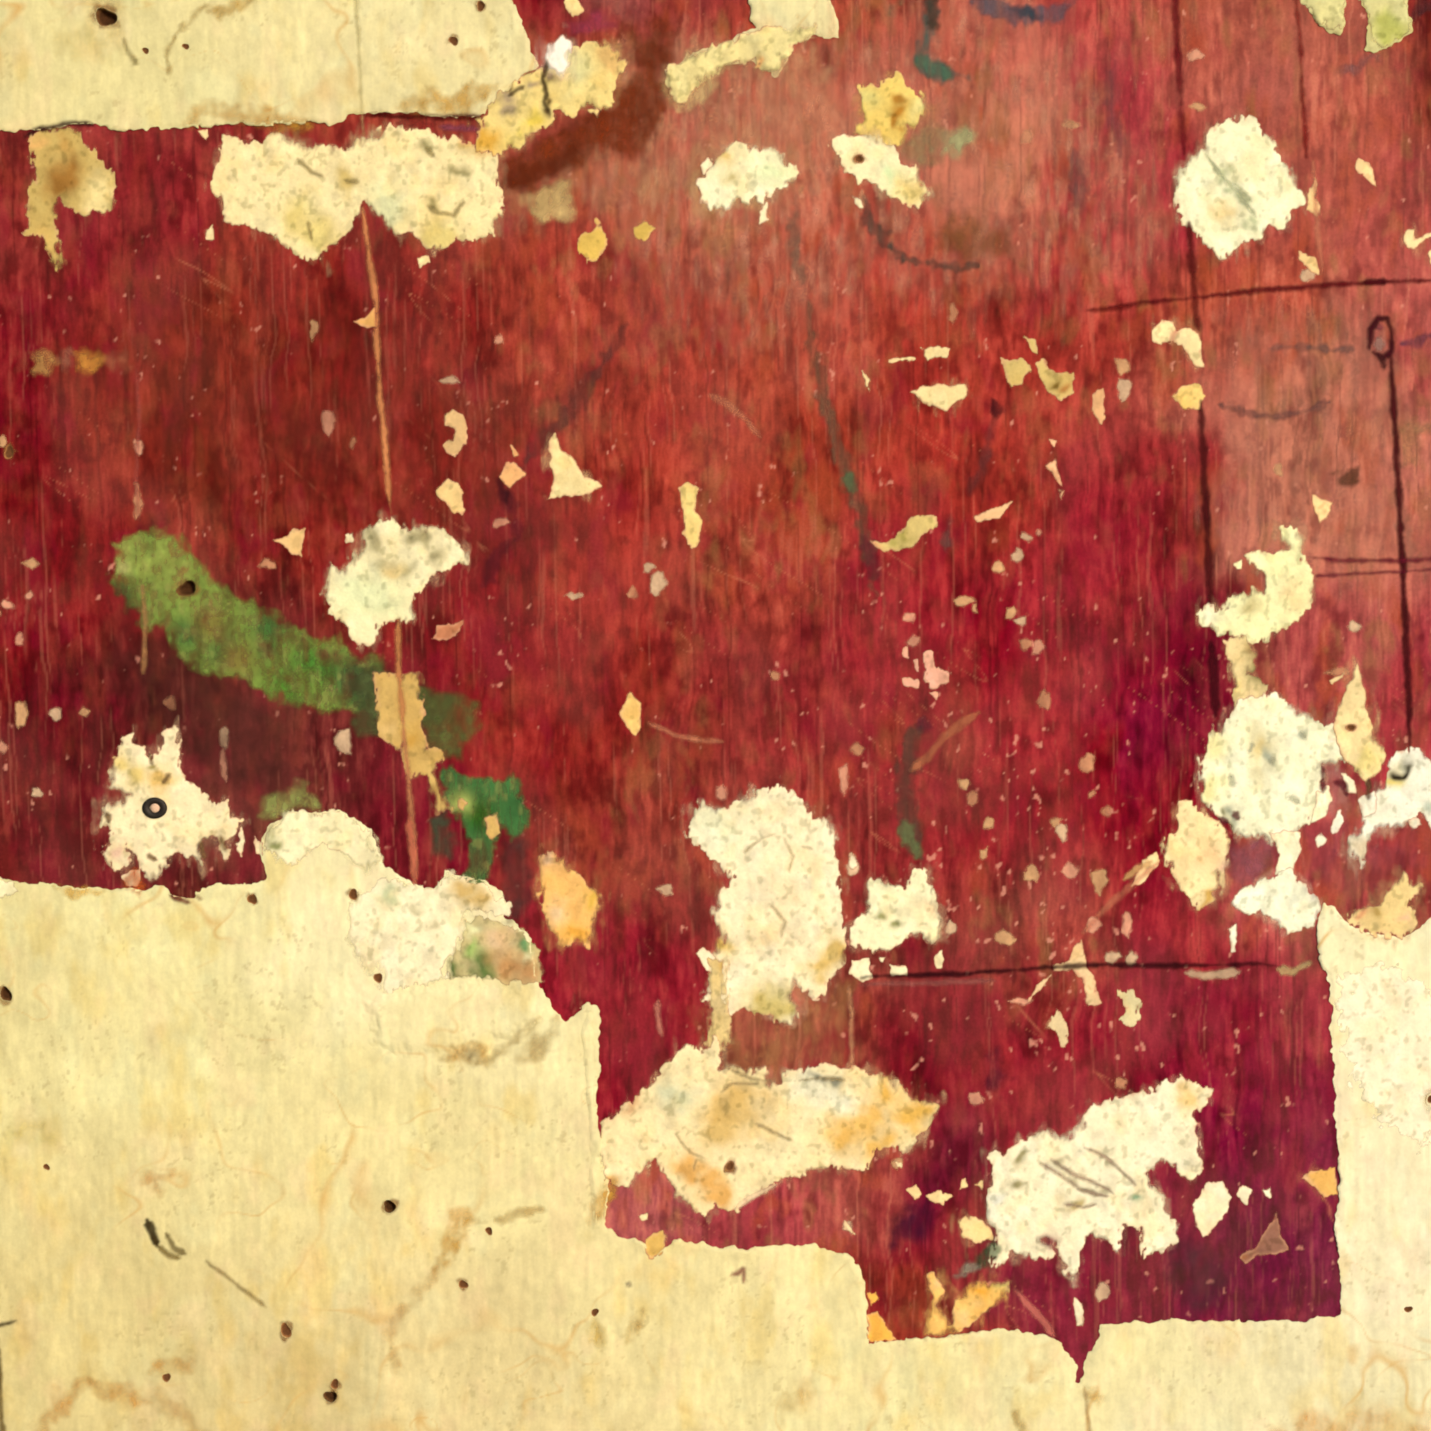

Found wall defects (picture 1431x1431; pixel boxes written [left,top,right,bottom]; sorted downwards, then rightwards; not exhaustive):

peeling [475,41,627,156]
spalling [210,102,596,261]
spalling [1173,114,1306,259]
spalling [325,518,469,646]
spalling [1196,525,1314,644]
spalling [99,725,245,880]
spalling [1197,692,1344,875]
spalling [1348,746,1431,869]
spalling [689,783,846,1025]
spalling [850,868,939,953]
spalling [600,1035,939,1217]
spalling [986,1074,1213,1275]